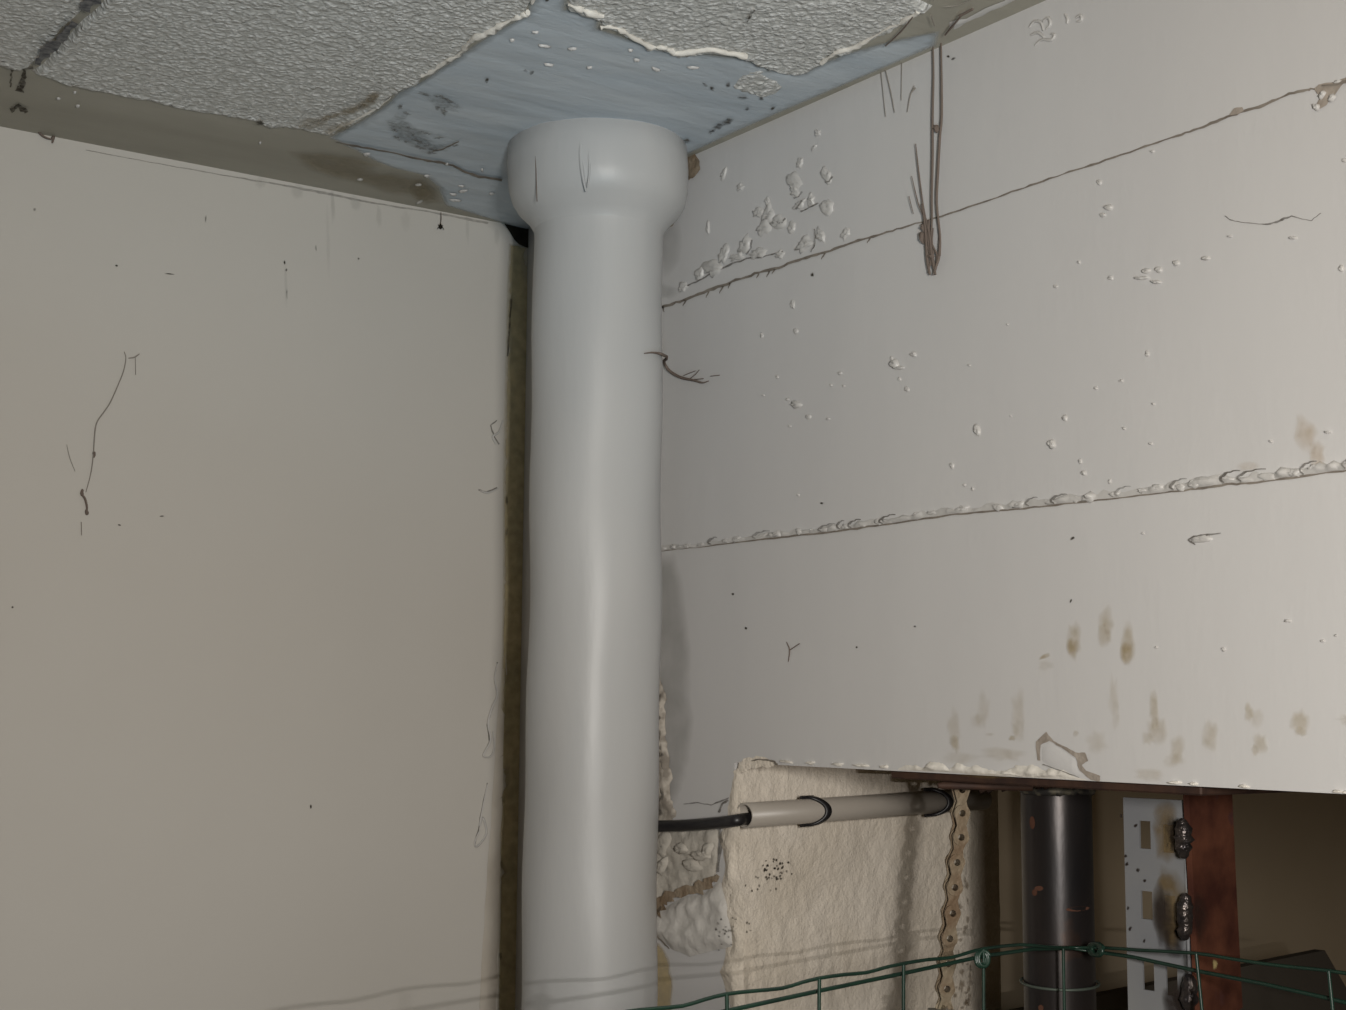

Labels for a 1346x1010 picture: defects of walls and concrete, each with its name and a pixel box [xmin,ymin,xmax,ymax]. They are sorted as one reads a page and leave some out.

spalling [688,154,700,180]
crack [662,88,1321,312]
crack [1220,468,1266,484]
crack [822,514,896,529]